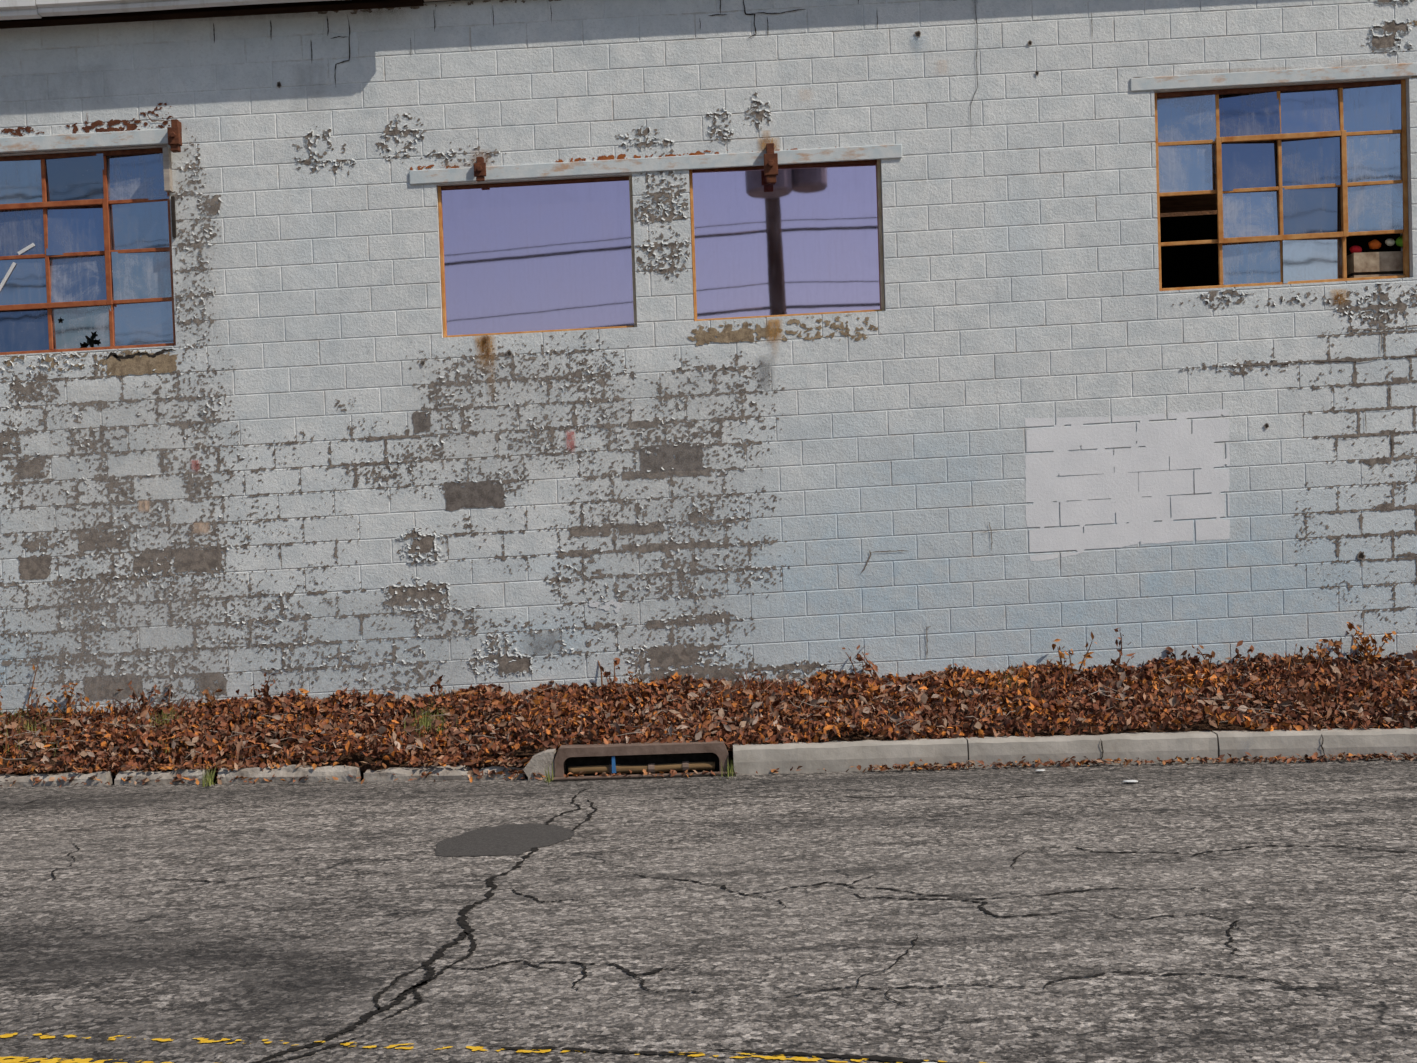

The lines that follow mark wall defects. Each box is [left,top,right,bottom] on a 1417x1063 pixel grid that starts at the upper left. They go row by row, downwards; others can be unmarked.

crack [311,15,350,86]
crack [700,0,803,38]
crack [970,11,978,139]
peeling [0,92,882,711]
peeling [1172,282,1417,634]
crack [113,844,399,882]
crack [251,788,661,1063]
crack [519,961,697,976]